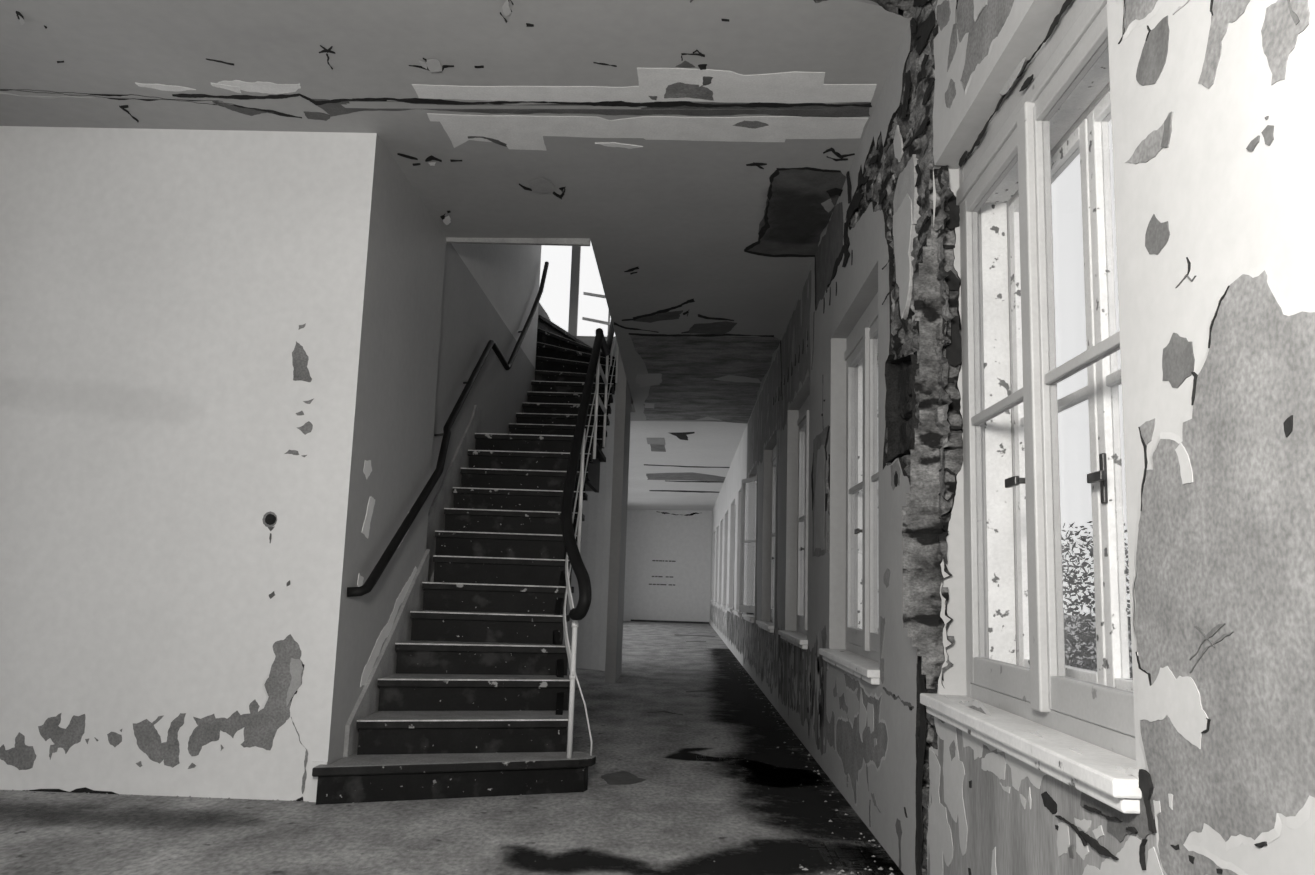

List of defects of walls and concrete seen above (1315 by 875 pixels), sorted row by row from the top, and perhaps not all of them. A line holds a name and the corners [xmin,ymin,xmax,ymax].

peeling [409,58,454,72]
crack [0,89,387,122]
peeling [292,323,312,382]
peeling [296,399,313,435]
peeling [629,0,1315,875]
peeling [0,632,307,770]